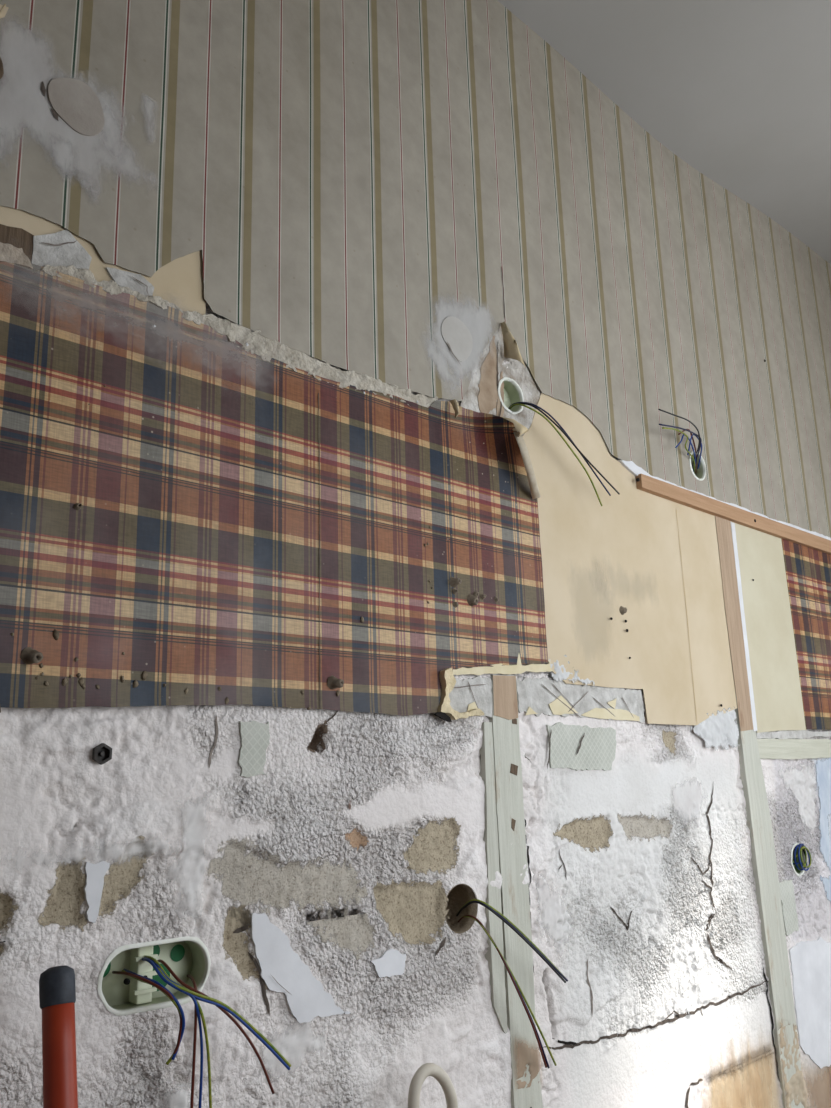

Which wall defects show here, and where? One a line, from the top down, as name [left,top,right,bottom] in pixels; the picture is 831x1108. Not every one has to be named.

flaking render [0,224,92,270]
flaking render [106,267,154,296]
flaking render [307,720,328,753]
flaking render [662,730,677,756]
flaking render [0,889,19,956]
flaking render [38,836,154,932]
flaking render [206,817,461,1023]
crack [524,820,532,916]
flaking render [553,811,673,852]
crack [544,782,780,1081]
flaking render [815,758,831,902]
flaking render [789,937,831,1069]